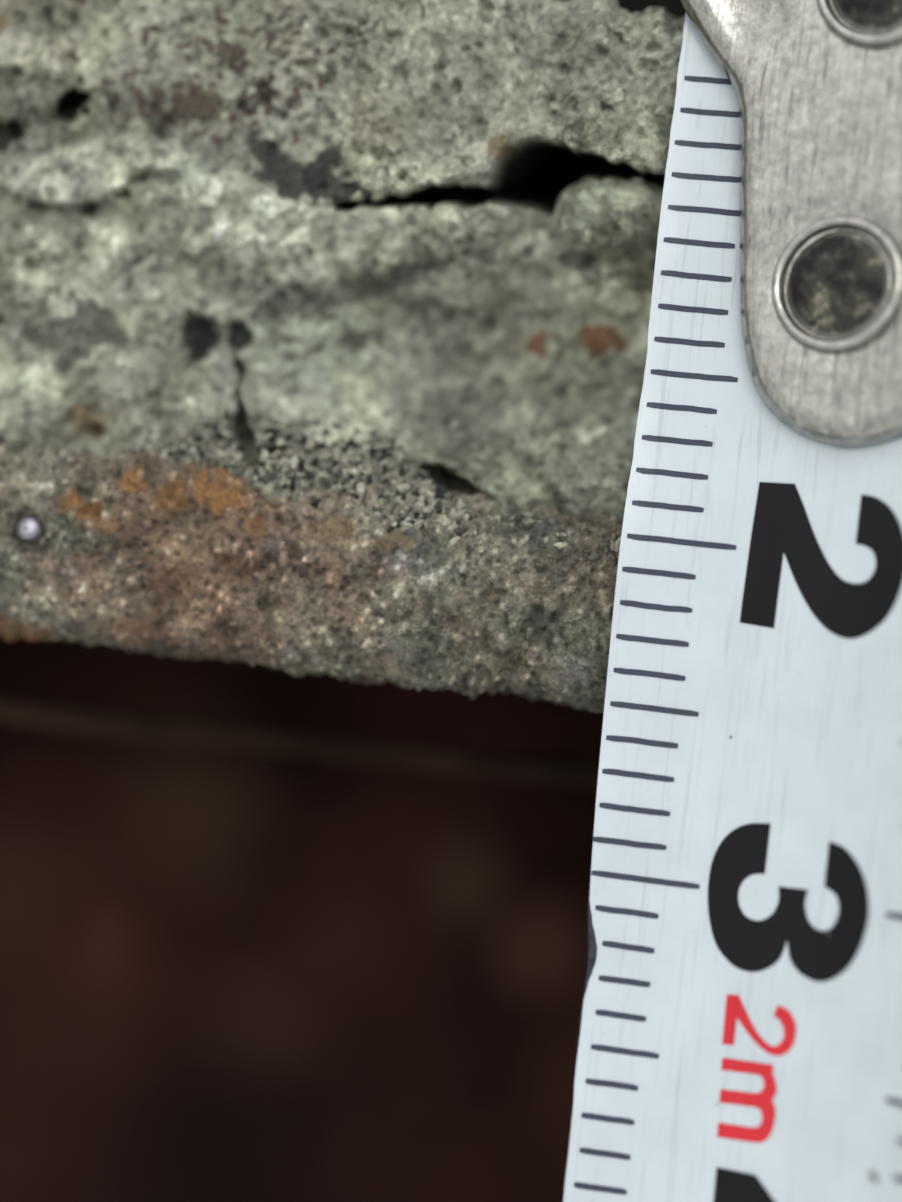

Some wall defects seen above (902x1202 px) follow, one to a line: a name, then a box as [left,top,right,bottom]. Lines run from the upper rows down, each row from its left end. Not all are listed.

crack [339,143,665,209]
corrosion [63,490,103,520]
corrosion [120,467,251,514]